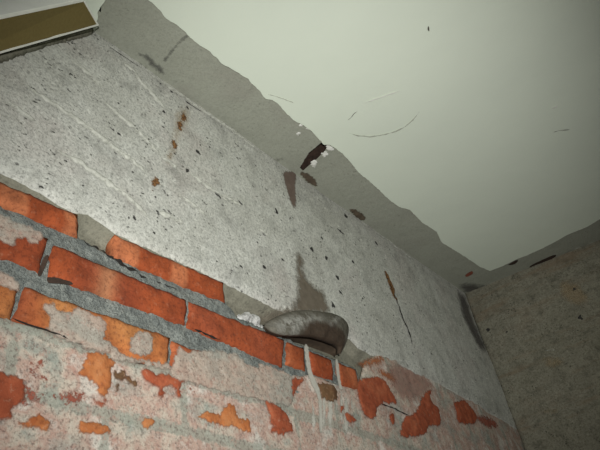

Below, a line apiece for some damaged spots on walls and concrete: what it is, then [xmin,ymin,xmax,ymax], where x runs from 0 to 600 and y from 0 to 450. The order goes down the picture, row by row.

peeling [95,0,600,293]
leakage [283,171,296,207]
peeling [0,215,43,245]
peeling [0,271,19,291]
spalling [47,277,73,285]
leakage [260,255,328,322]
crack [385,271,413,345]
leakage [459,286,485,349]
peeling [44,303,304,436]
leakage [304,345,353,433]
spalling [357,357,441,438]
spalling [454,400,498,429]